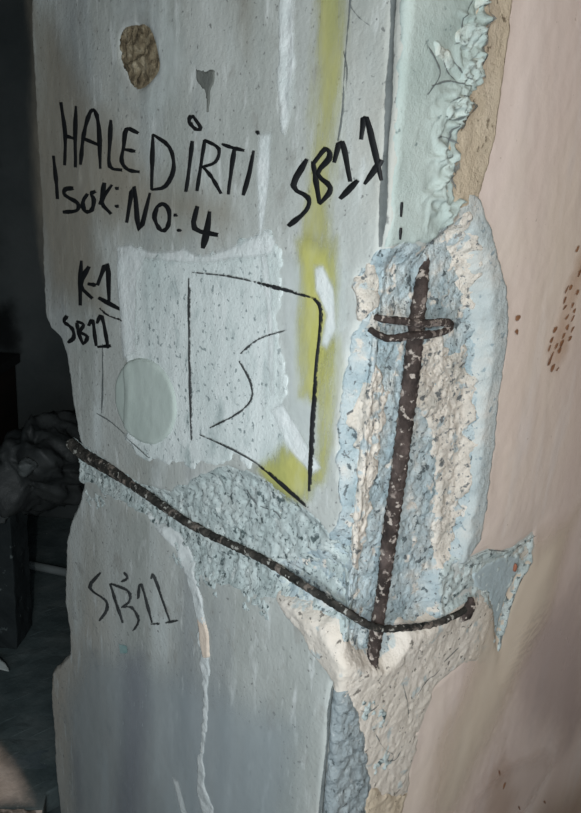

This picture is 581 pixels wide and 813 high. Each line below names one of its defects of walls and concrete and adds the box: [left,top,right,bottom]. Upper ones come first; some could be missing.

spalling [78,0,535,813]
corrosion [548,285,579,372]